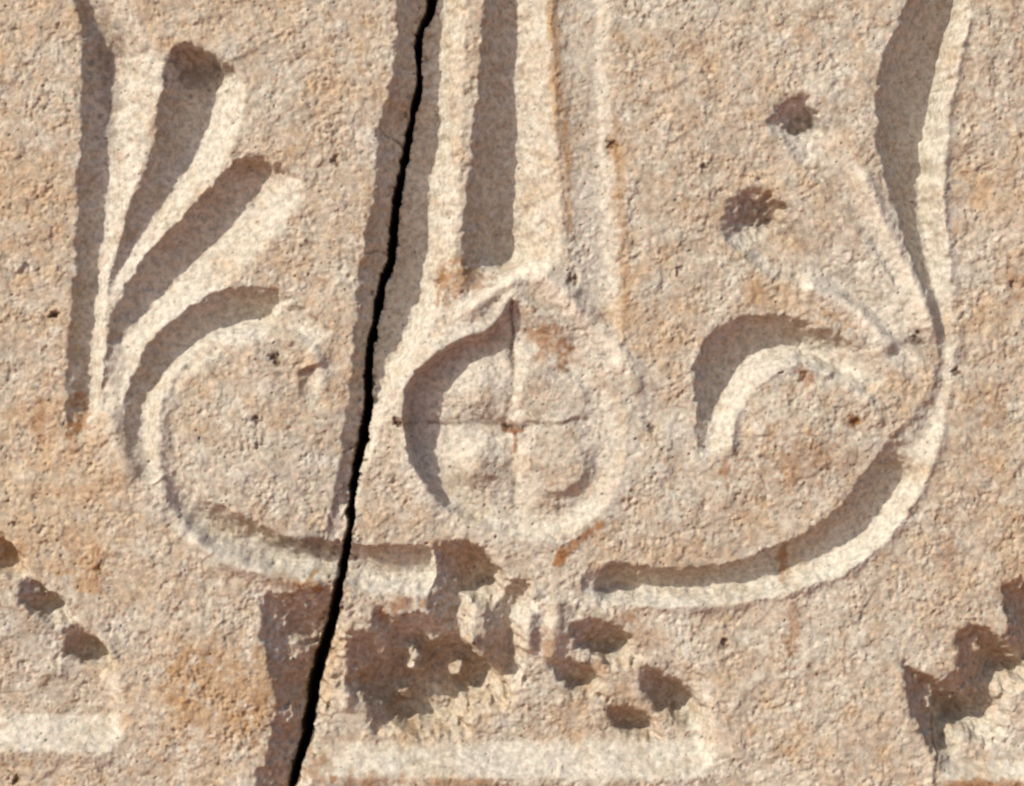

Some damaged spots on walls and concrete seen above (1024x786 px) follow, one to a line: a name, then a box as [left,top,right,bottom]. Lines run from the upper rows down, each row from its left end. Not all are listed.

crack [289,0,438,786]
spalling [259,586,332,786]
spalling [335,540,532,734]
spalling [549,619,628,685]
spalling [607,665,692,729]
spalling [904,578,1024,752]